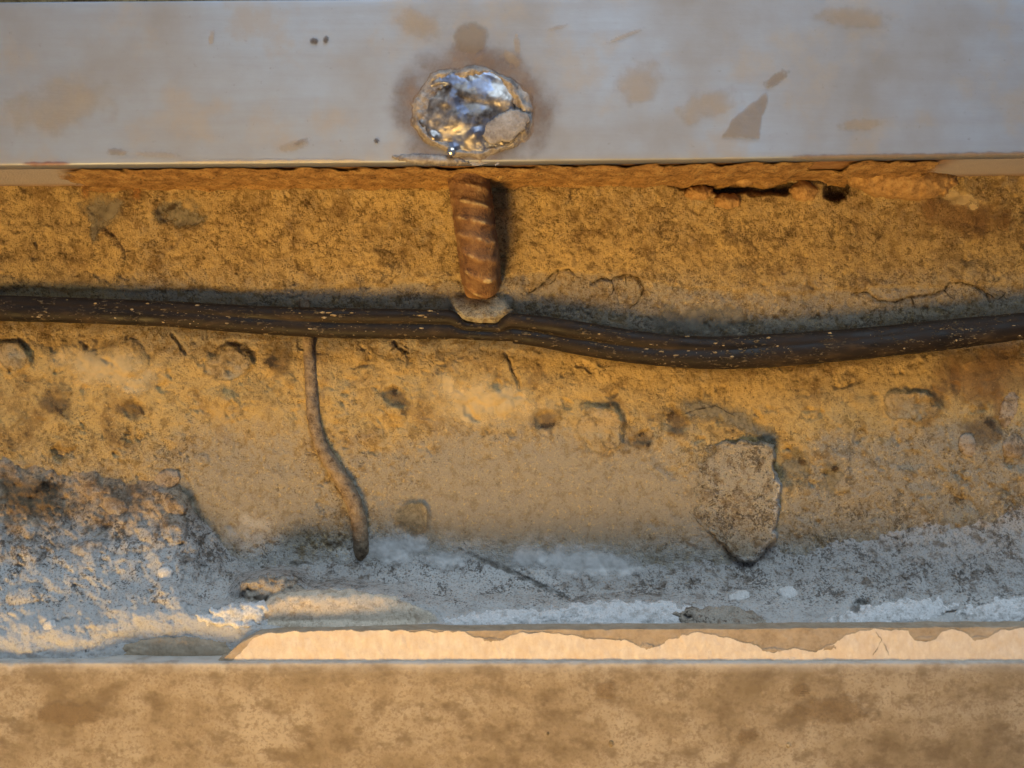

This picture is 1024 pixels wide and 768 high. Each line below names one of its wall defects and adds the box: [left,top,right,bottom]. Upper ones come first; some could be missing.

spalling [154,202,206,229]
spalling [447,168,502,299]
crack [529,268,653,309]
crack [853,282,1005,305]
spalling [265,349,289,372]
spalling [40,390,70,417]
spalling [384,387,407,406]
spalling [3,477,59,513]
peeling [666,401,844,563]
damp [366,534,465,568]
damp [512,546,642,577]
flaking render [232,628,1024,661]